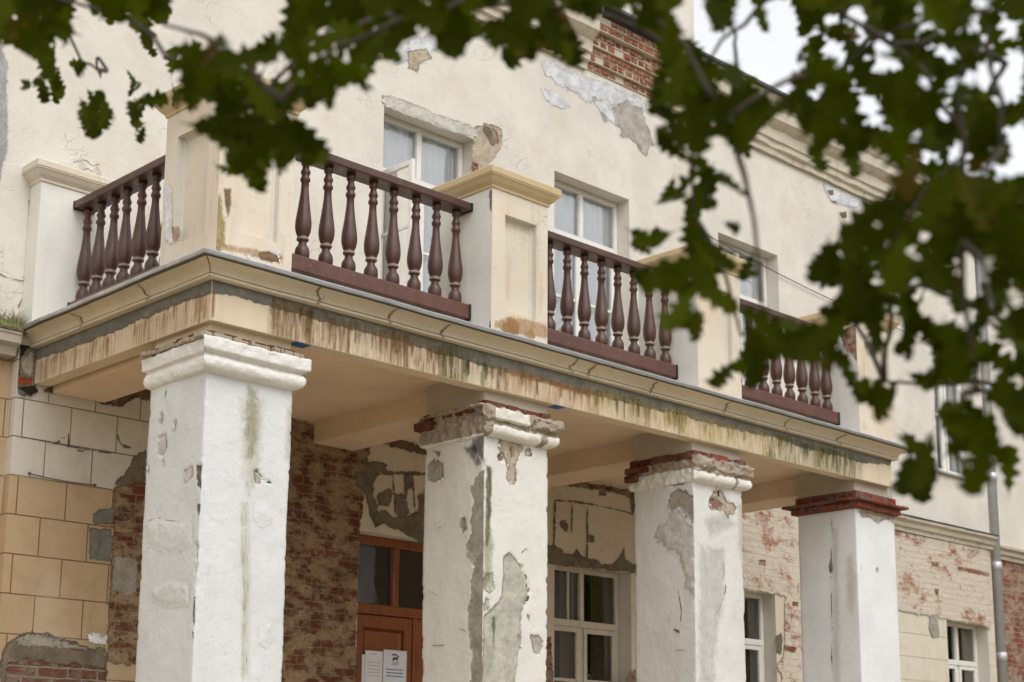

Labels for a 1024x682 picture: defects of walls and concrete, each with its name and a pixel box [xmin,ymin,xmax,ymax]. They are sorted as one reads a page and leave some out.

spalling [393,34,437,72]
spalling [382,95,503,172]
peeling [541,60,654,159]
spalling [17,280,891,465]
spalling [497,439,532,484]
spalling [0,412,177,682]
spalling [281,418,444,682]
spalling [460,471,554,682]
spalling [547,545,636,573]
peeling [654,482,695,600]
spalling [709,487,803,682]
spalling [859,510,991,637]